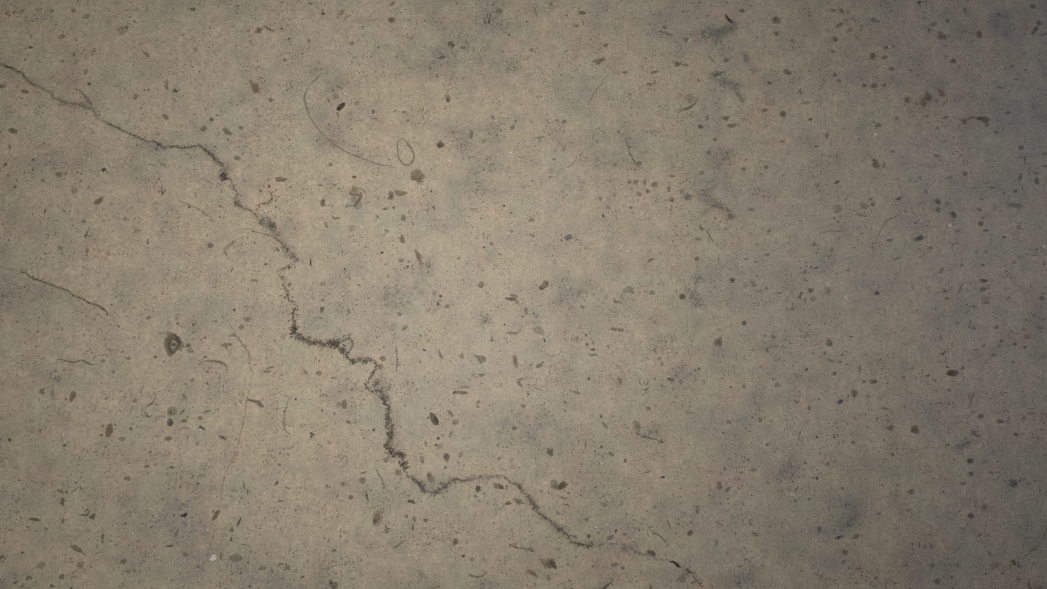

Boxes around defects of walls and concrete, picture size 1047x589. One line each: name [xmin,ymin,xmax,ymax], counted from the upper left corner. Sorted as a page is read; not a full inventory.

crack [286,294,449,494]